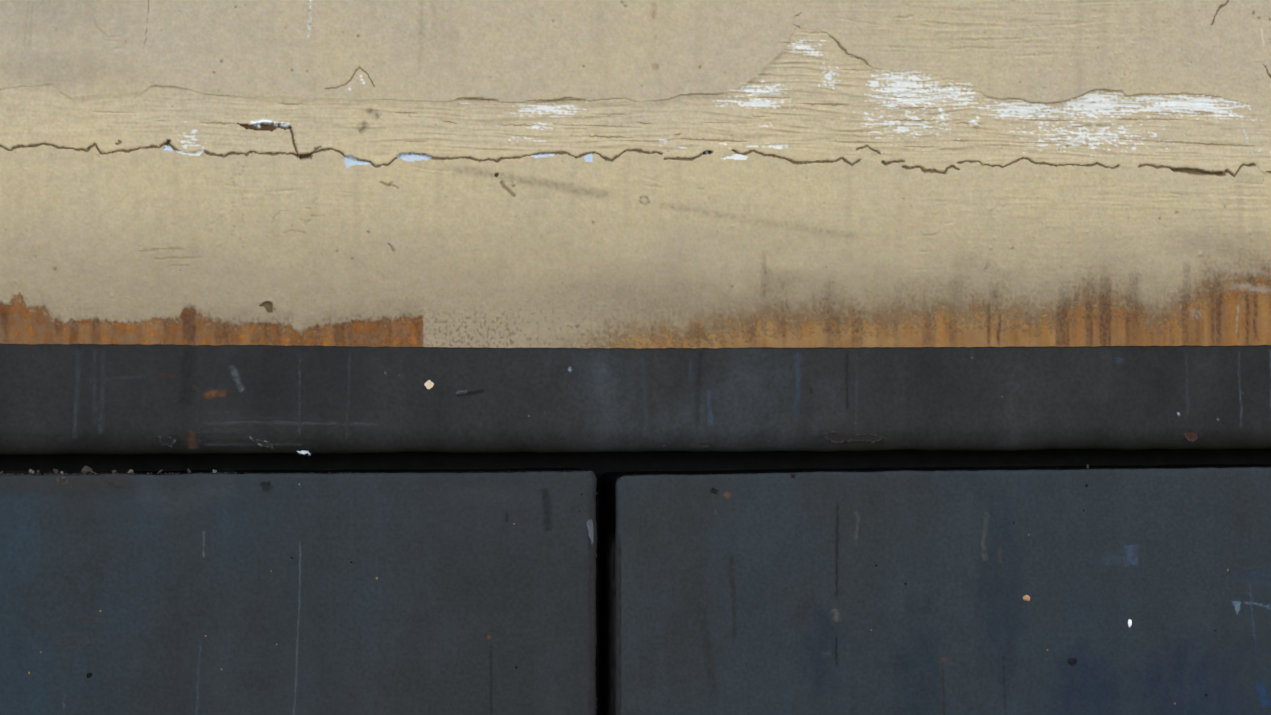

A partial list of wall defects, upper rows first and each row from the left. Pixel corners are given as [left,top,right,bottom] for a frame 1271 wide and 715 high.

peeling [0,25,1271,199]
crack [0,126,1271,179]
rust [607,270,1271,349]